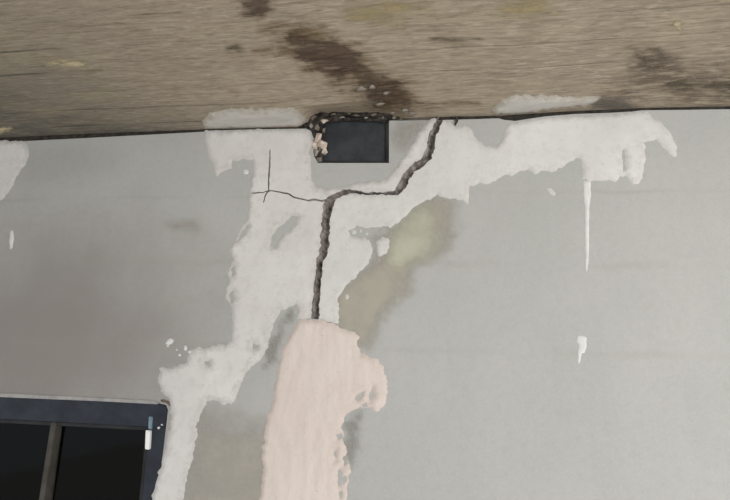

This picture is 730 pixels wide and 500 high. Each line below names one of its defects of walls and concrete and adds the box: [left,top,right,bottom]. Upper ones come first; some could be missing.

spalling [304,112,403,163]
leakage [330,201,450,343]
crack [252,106,730,319]
leakage [185,425,264,500]